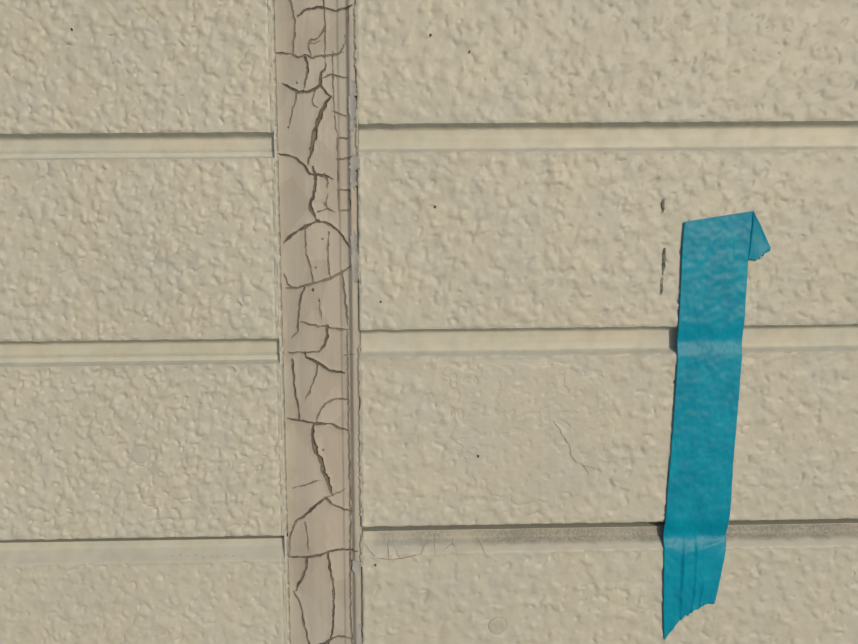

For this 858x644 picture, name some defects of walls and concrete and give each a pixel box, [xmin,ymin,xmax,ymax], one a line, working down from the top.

crack [276,0,457,644]